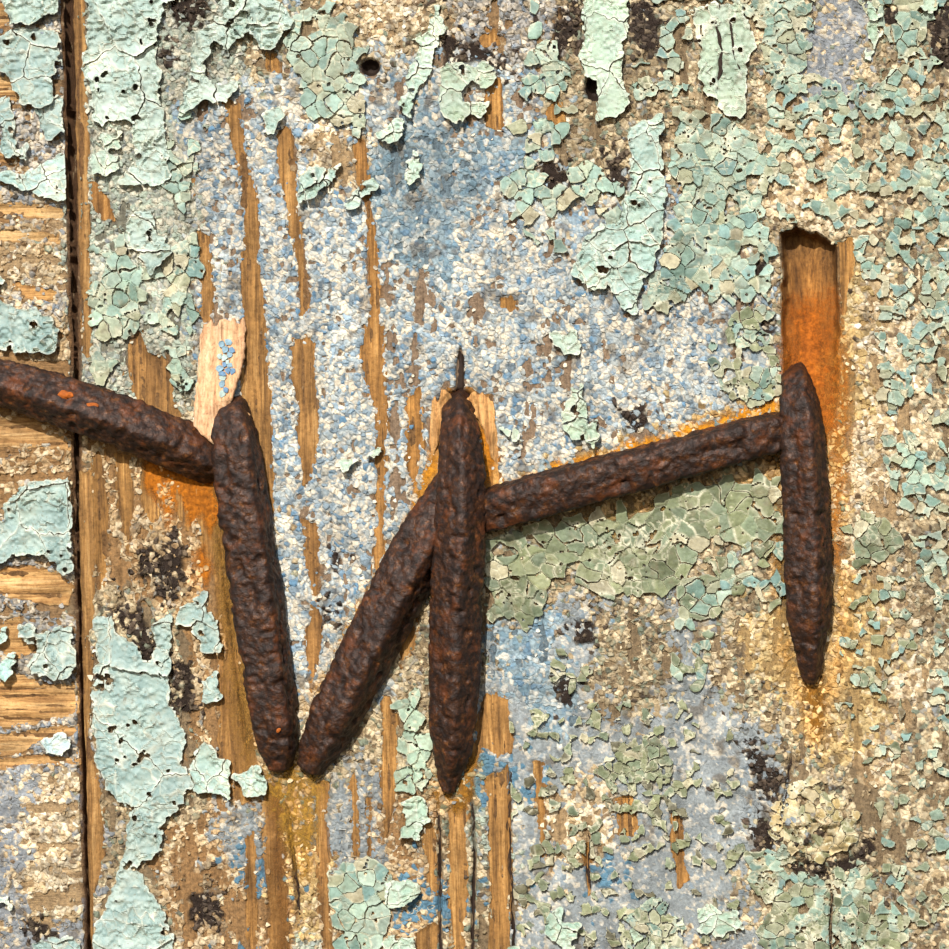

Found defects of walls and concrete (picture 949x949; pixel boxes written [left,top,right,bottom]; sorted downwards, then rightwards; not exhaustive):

peeling [578,0,630,121]
peeling [690,0,757,119]
peeling [0,0,175,361]
peeling [178,0,294,514]
peeling [570,113,668,315]
corrosion [58,390,74,399]
corrosion [411,454,438,510]
corrosion [479,429,495,478]
corrosion [611,401,778,451]
corrosion [780,298,848,564]
peeling [0,446,290,949]
corrosion [432,753,477,813]